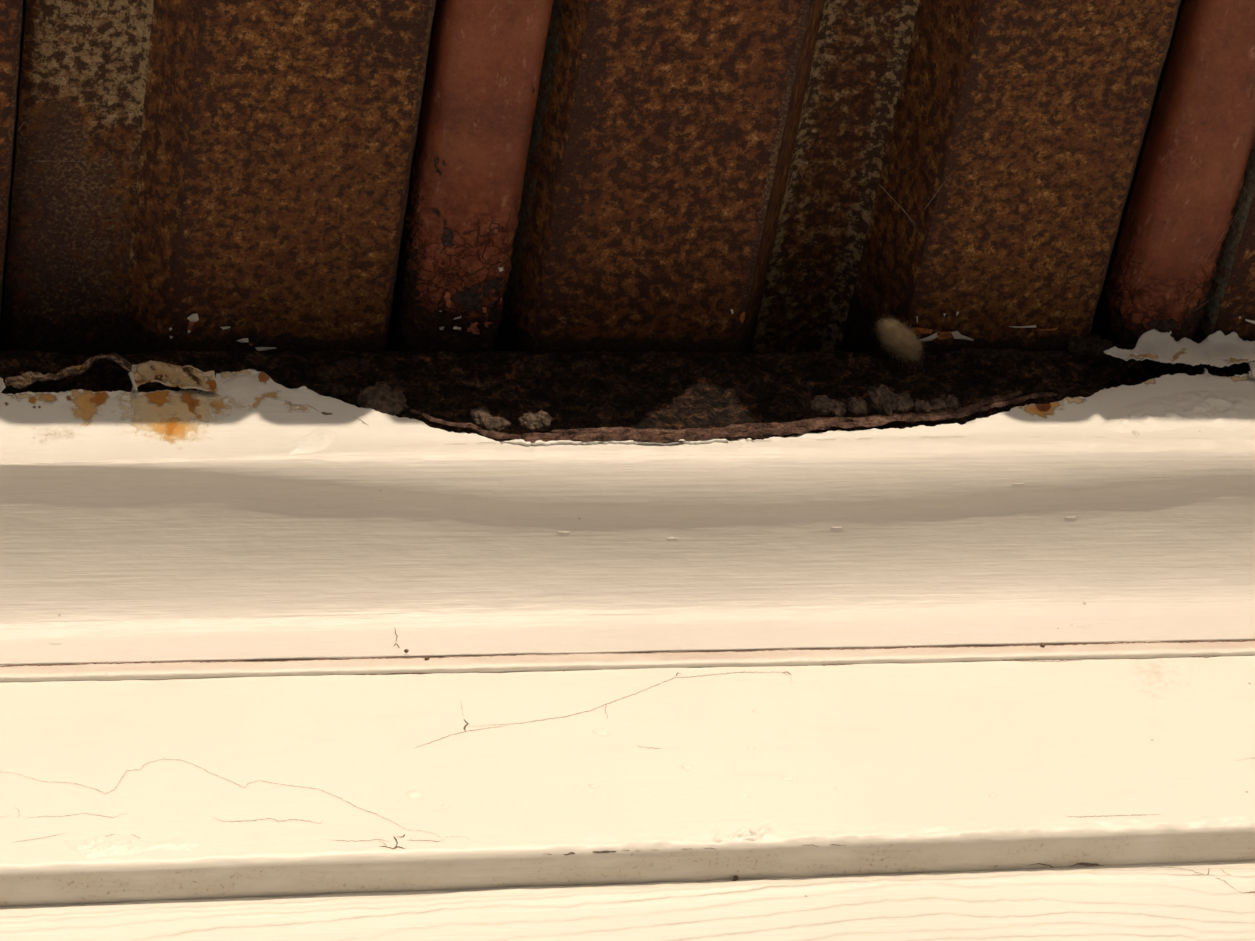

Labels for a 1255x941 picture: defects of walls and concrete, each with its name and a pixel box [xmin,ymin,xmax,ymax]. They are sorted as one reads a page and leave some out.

peeling [0,352,269,394]
peeling [187,314,278,351]
peeling [439,267,504,334]
peeling [911,316,974,342]
peeling [1104,316,1255,380]
rust [5,390,239,442]
crack [0,640,1255,748]
crack [4,759,470,854]